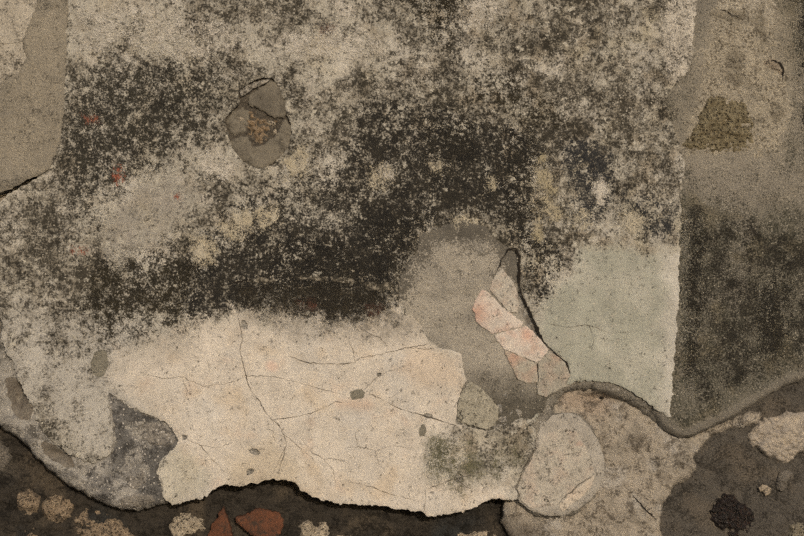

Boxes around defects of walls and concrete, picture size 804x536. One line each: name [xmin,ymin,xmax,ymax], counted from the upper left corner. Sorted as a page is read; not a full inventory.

water stain [53,2,247,228]
spalling [225,78,292,169]
water stain [77,59,804,408]
spalling [5,377,33,420]
spalling [41,442,74,467]
spalling [83,393,178,510]
crack [142,318,401,485]
crack [290,330,455,440]
crack [368,472,477,514]